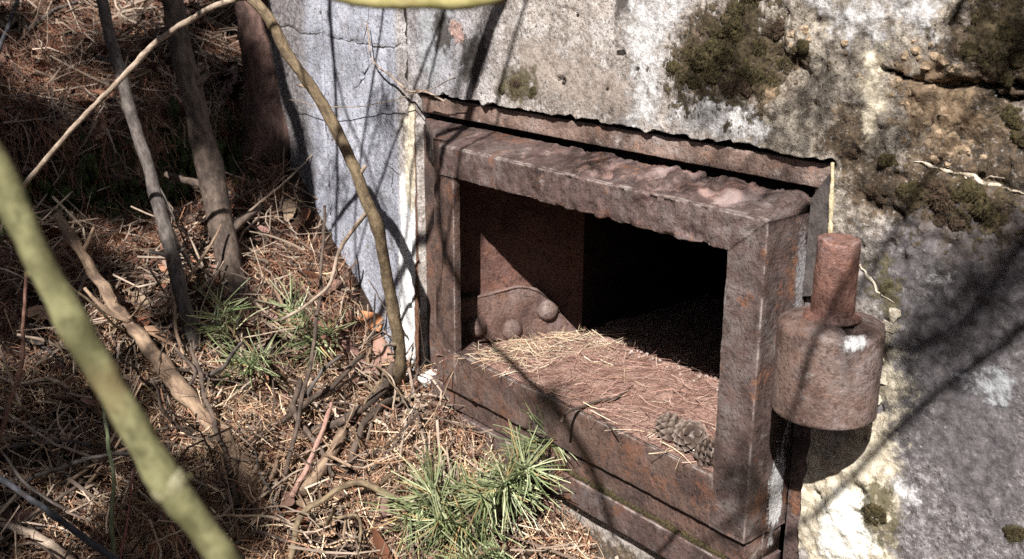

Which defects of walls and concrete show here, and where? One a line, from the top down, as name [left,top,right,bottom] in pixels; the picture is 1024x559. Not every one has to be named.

leakage [510,0,771,144]
rust [762,88,777,102]
crack [914,161,1024,194]